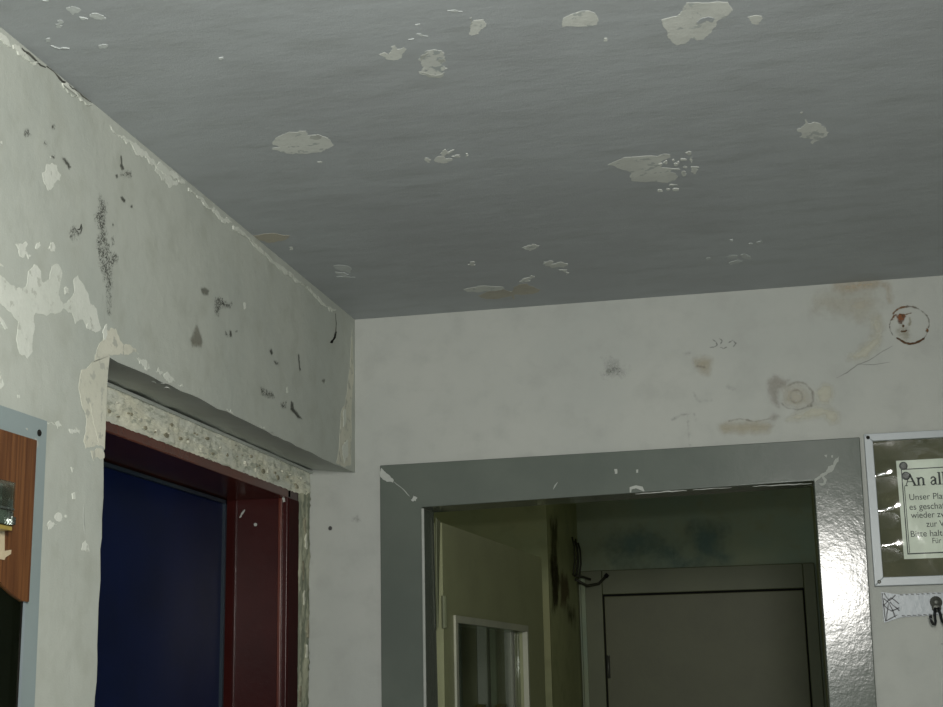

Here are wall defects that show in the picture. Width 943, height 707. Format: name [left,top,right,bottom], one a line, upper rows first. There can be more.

peeling [562,11,598,27]
peeling [661,2,733,45]
peeling [418,49,447,78]
peeling [272,131,333,163]
peeling [42,155,61,191]
peeling [608,151,699,192]
water stain [96,203,117,287]
corrosion [889,306,929,345]
spalling [0,242,313,707]
peeling [630,485,732,494]
peeling [752,455,839,498]
water stain [550,521,568,608]